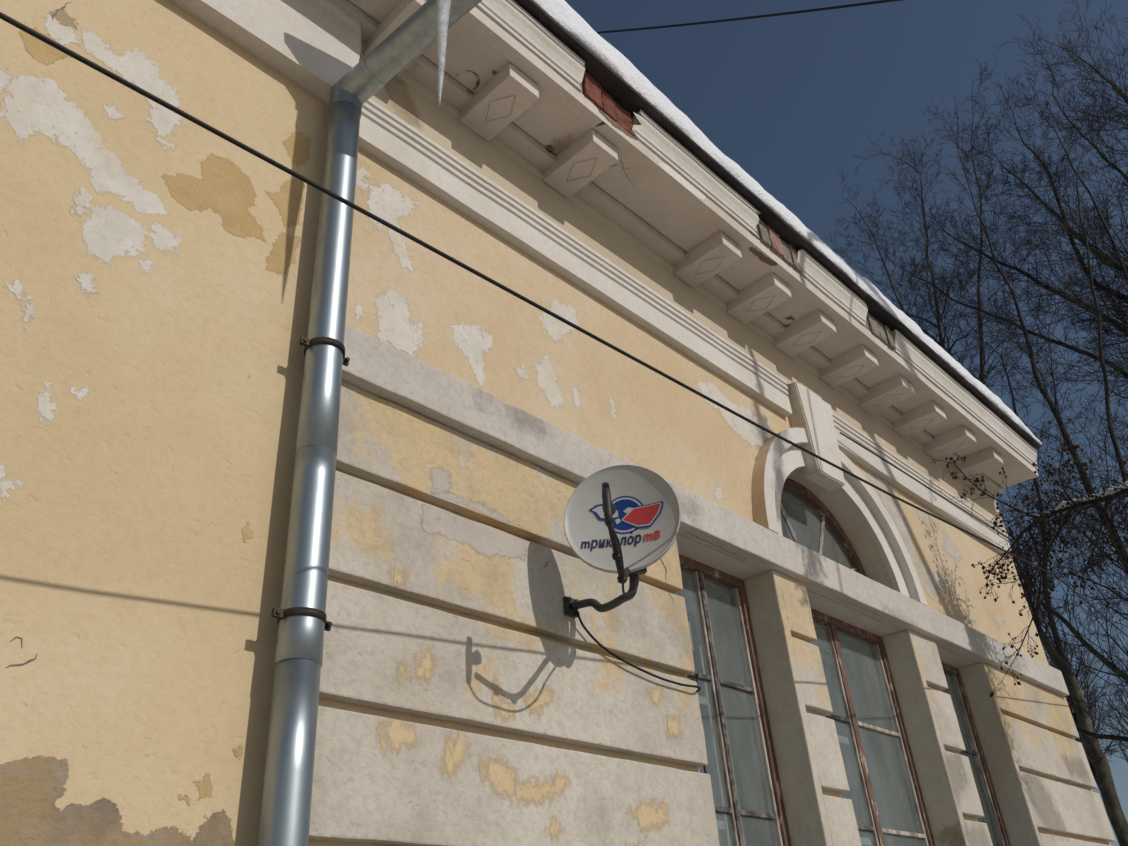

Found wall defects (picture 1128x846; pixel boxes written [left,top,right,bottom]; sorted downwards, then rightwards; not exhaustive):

spalling [579,72,637,140]
peeling [0,8,311,298]
peeling [2,279,36,332]
peeling [35,382,58,428]
peeling [696,380,773,449]
peeling [0,462,25,502]
peeling [492,676,554,721]
peeling [0,755,235,846]
peeling [440,731,570,840]